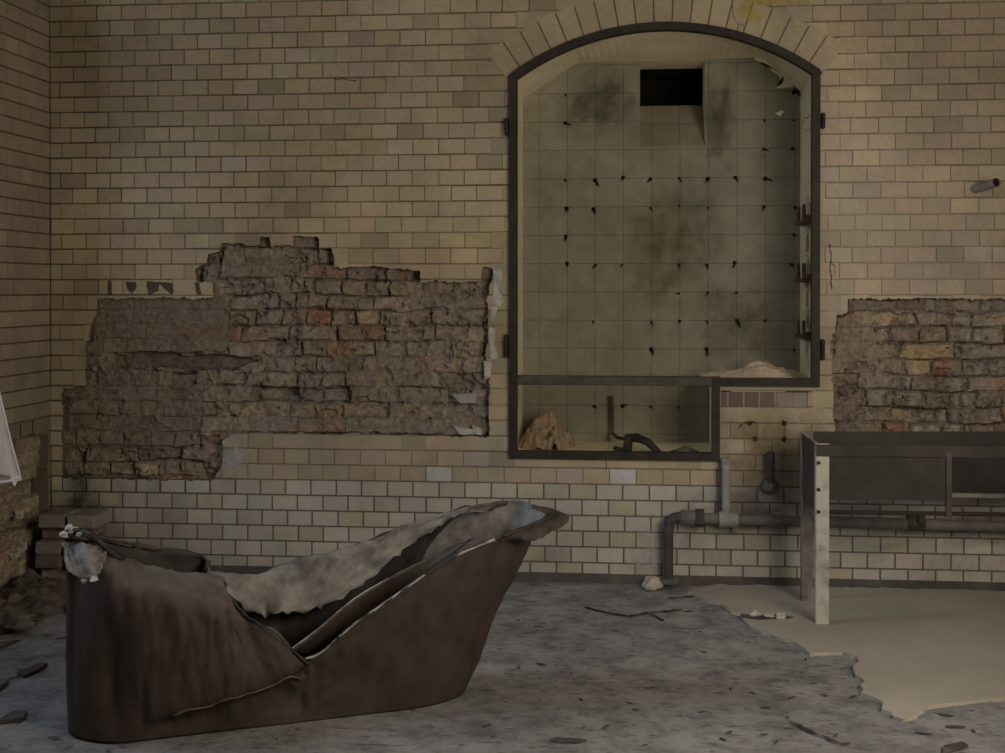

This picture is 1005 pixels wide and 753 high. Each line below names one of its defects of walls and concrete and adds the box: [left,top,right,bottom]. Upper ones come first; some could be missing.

spalling [64,236,504,482]
spalling [828,298,1005,431]